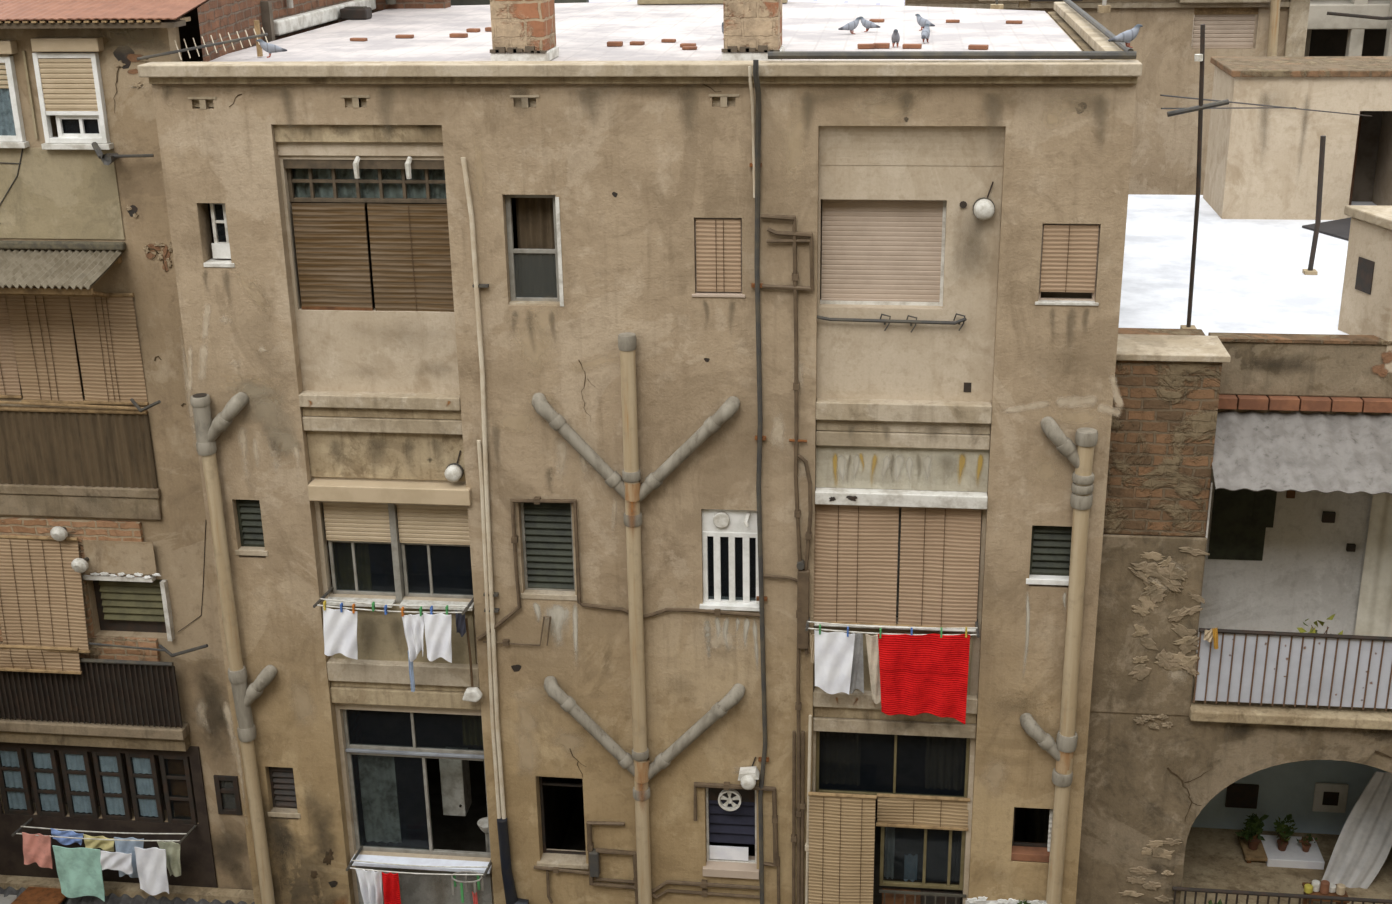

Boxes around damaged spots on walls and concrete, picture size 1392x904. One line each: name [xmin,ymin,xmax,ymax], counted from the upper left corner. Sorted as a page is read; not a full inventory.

spalling [143,241,172,272]
flaking render [1128,547,1210,681]
crack [1167,768,1213,821]
spalling [1118,838,1183,904]